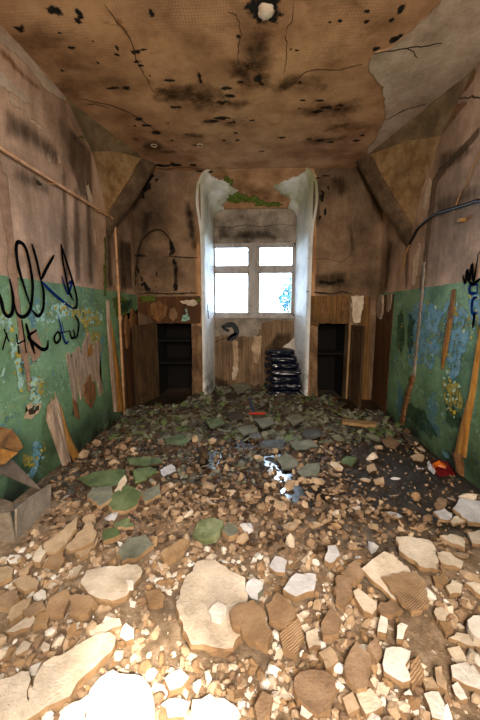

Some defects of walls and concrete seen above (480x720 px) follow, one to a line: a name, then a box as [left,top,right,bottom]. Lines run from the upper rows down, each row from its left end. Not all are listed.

crack [104,4,157,94]
water stain [163,32,268,109]
crack [228,12,242,70]
crack [280,1,362,92]
crack [375,43,442,58]
flaking render [367,0,480,155]
crack [79,98,157,131]
water stain [204,116,239,142]
water stain [308,100,354,115]
water stain [316,175,344,219]
water stain [318,274,344,285]
flaking render [341,295,364,323]